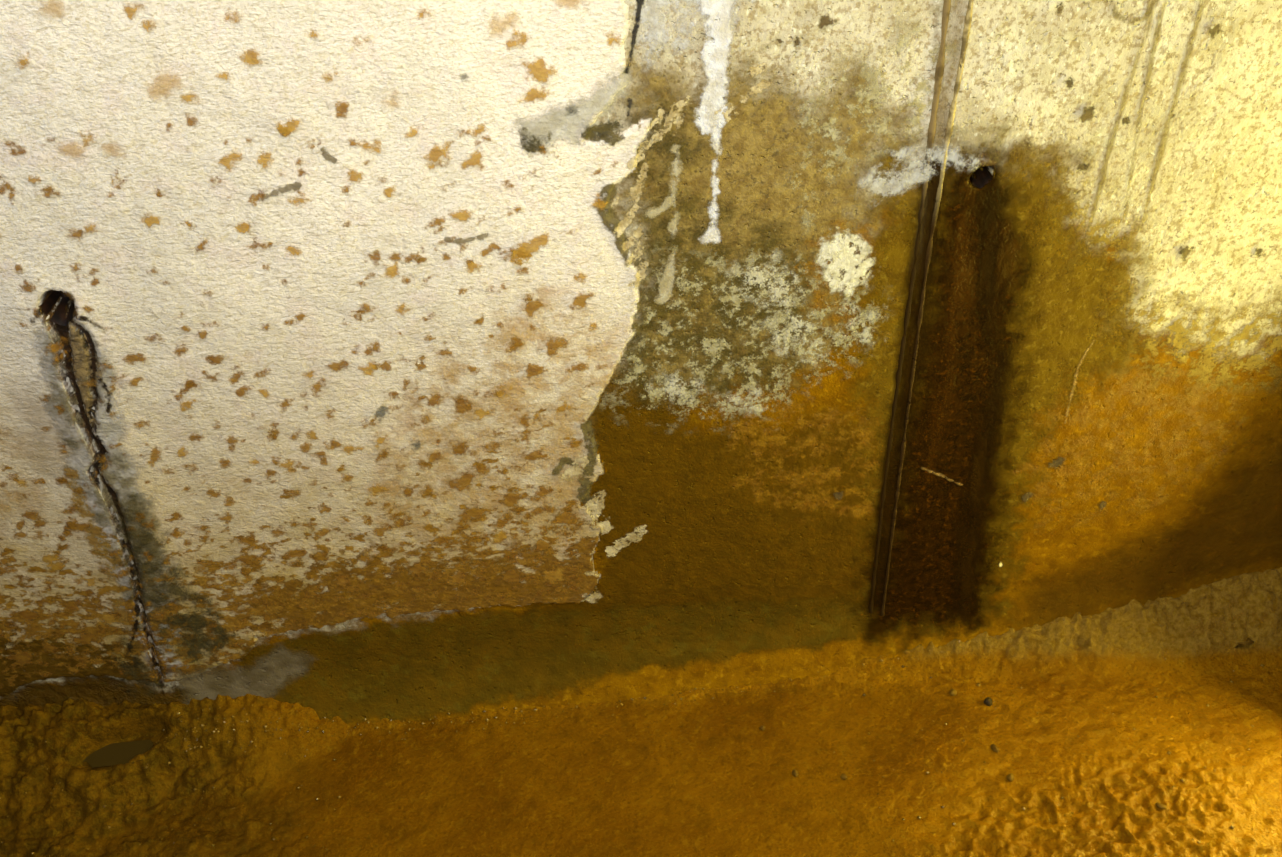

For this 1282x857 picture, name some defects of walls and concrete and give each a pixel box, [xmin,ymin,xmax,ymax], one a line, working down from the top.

peeling [818,14,837,29]
rust [277,119,300,136]
rust [336,102,349,118]
rust [424,125,490,169]
rust [523,58,556,102]
crack [624,0,644,116]
peeling [714,63,771,123]
water stain [581,0,979,447]
peeling [0,0,690,683]
rust [0,139,1282,722]
crack [30,301,167,693]
water stain [179,647,313,705]